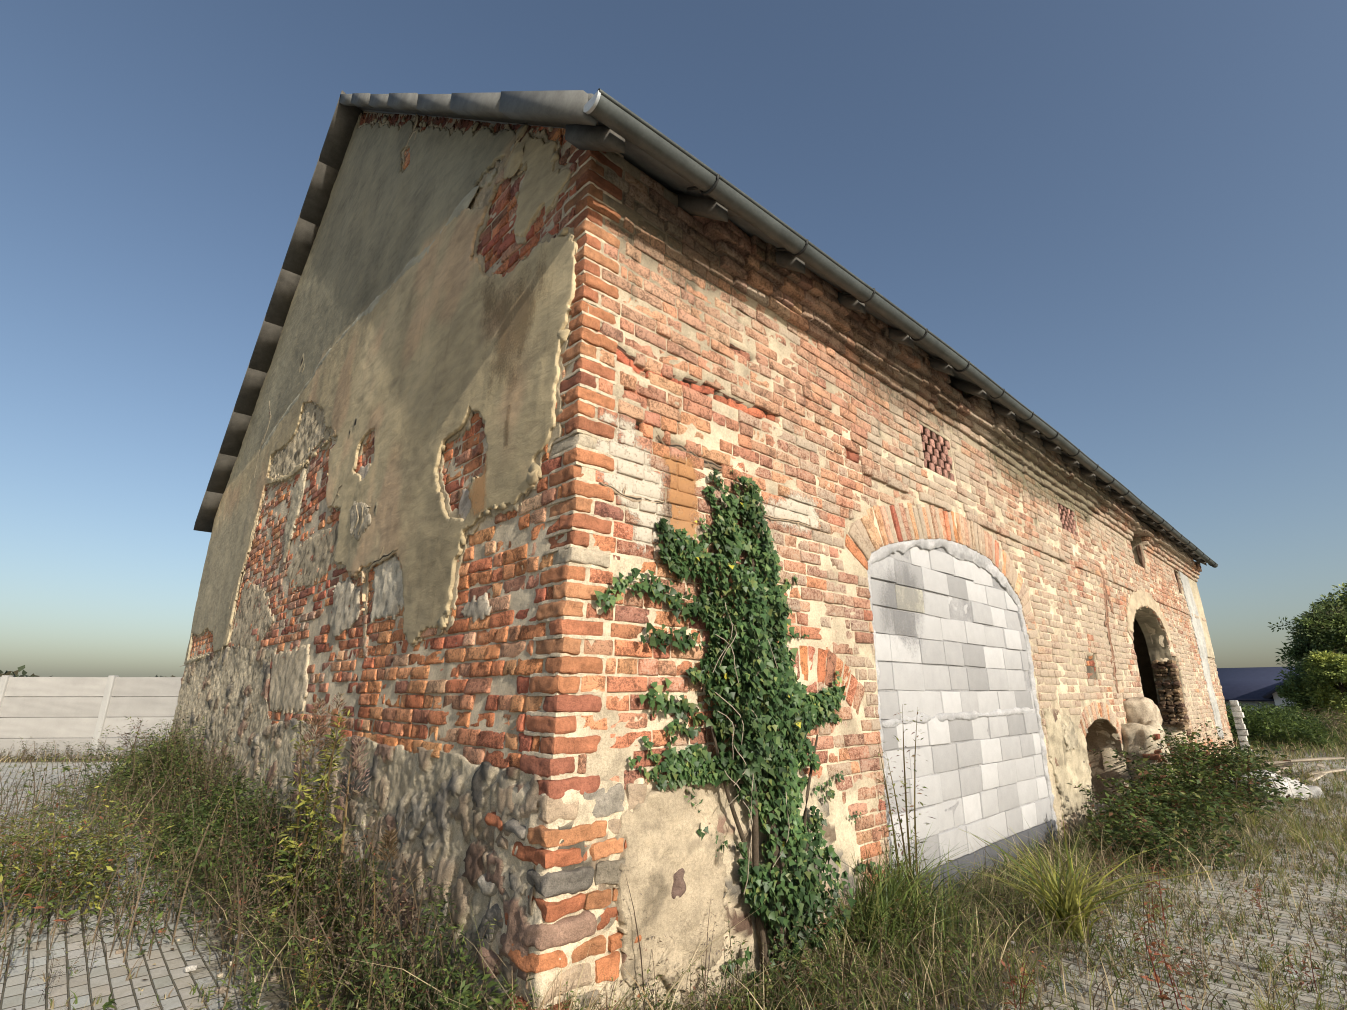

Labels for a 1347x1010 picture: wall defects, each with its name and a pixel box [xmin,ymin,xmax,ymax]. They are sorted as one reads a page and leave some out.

flaking render [360,113,579,277]
leakage [485,274,542,378]
flaking render [556,329,575,409]
flaking render [180,403,567,783]